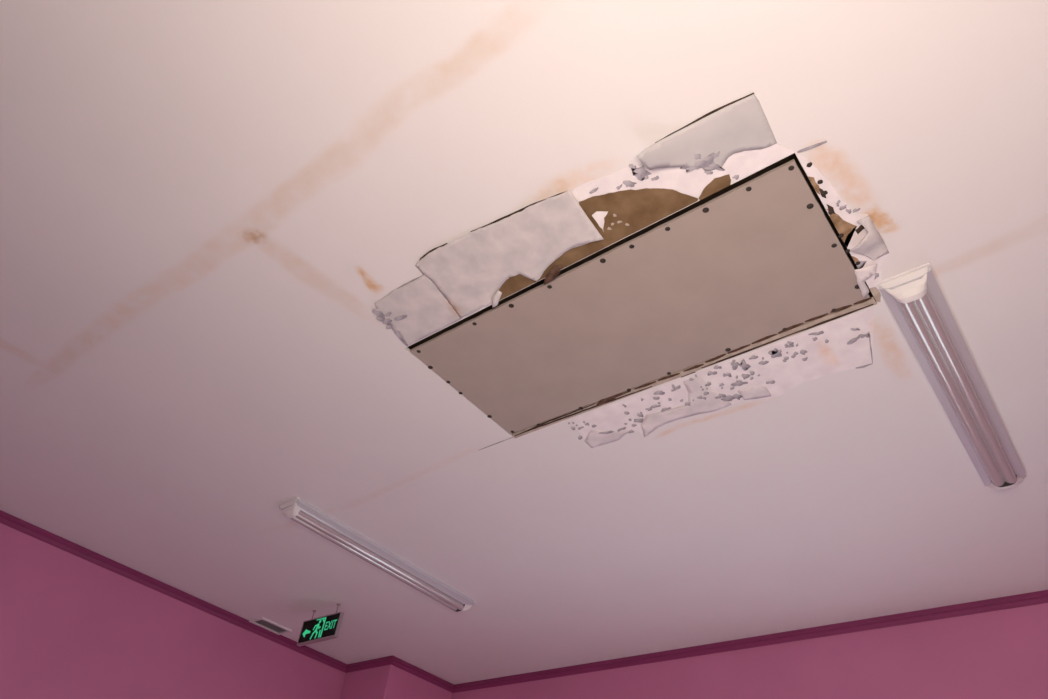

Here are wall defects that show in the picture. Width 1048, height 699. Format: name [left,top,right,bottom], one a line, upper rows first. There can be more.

peeling [372,93,889,448]